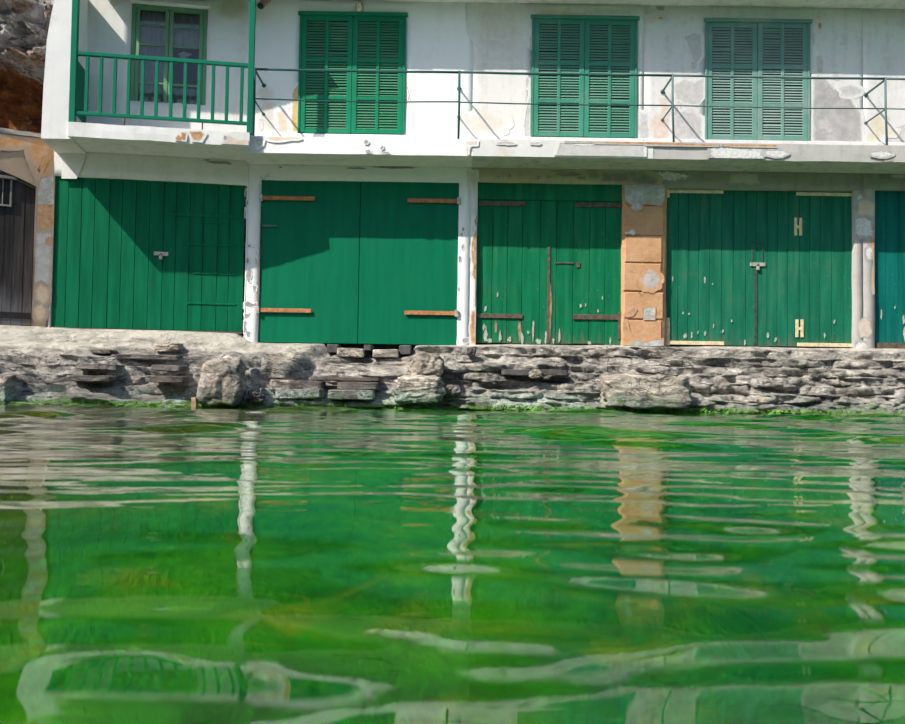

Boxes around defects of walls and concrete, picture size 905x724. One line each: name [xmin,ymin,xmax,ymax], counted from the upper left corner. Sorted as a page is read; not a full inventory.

peeling [553,30,790,159]
peeling [810,32,865,142]
peeling [869,149,895,159]
peeling [34,204,54,286]
peeling [243,244,258,338]
peeling [458,196,487,312]
peeling [483,283,561,344]
peeling [855,217,875,295]
flaking render [855,309,882,348]